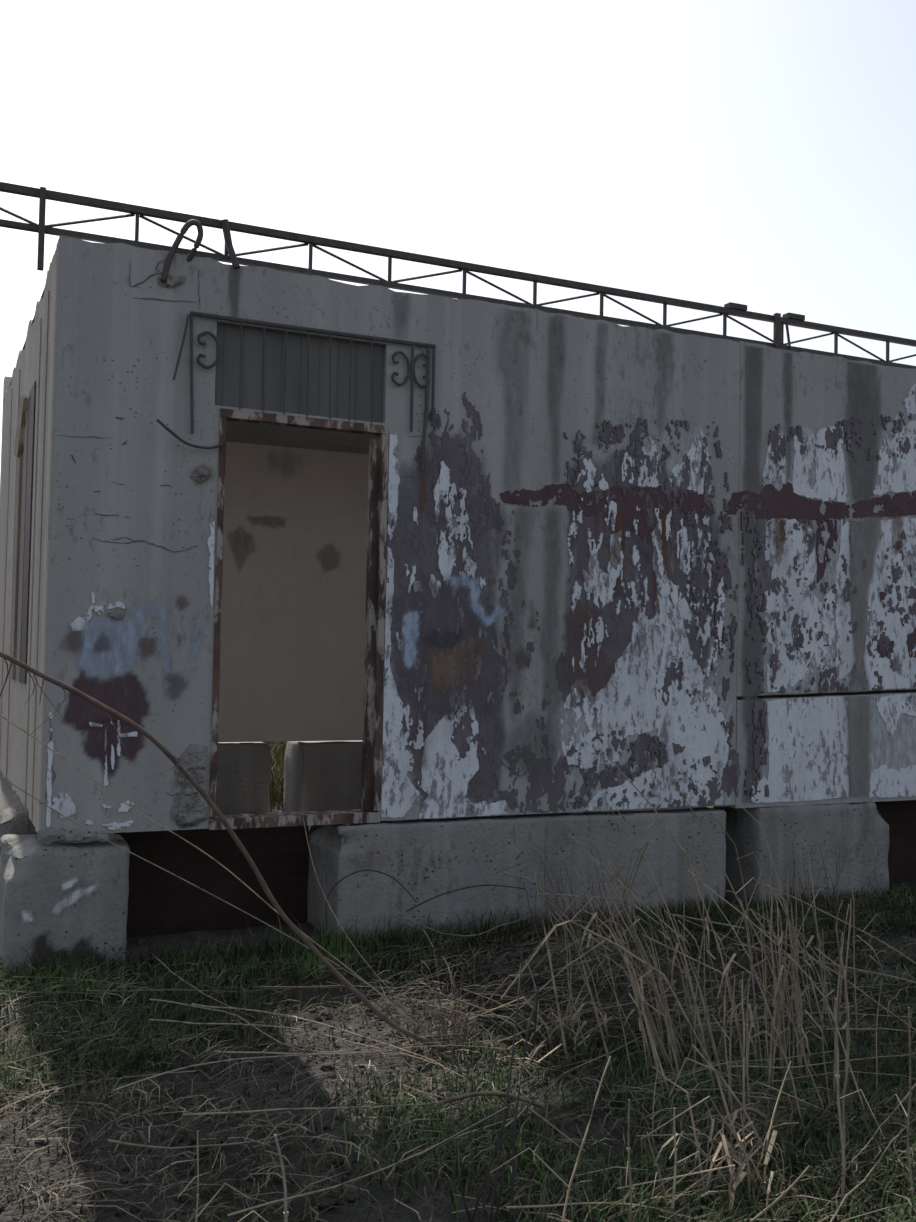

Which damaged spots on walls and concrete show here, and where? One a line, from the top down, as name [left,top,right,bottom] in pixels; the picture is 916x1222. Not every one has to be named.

crack [58,417,128,462]
crack [92,482,198,552]
peeling [70,592,127,631]
peeling [381,384,916,819]
water stain [557,346,916,812]
spalling [170,743,210,828]